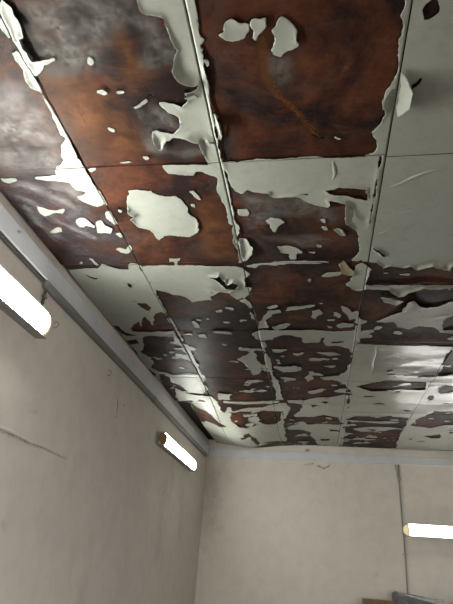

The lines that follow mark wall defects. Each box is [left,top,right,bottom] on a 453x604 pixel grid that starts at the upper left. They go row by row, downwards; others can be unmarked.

peeling [0,0,453,449]